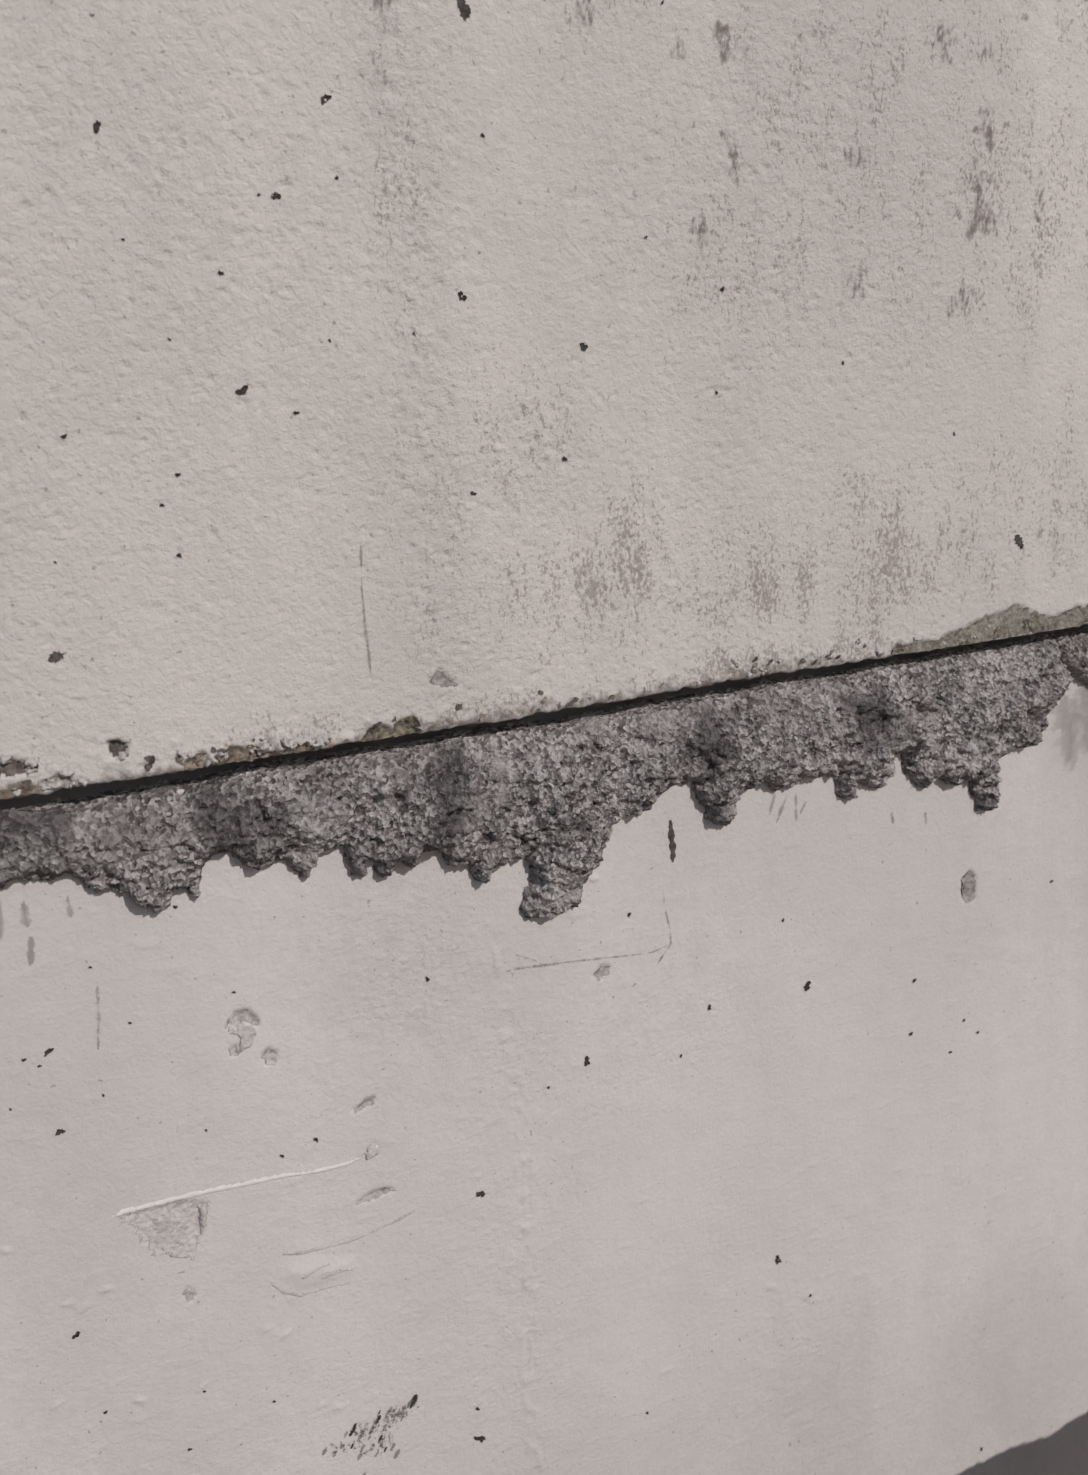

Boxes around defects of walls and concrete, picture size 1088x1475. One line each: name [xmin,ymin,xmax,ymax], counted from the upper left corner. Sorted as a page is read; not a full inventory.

peeling [855,604,1088,657]
peeling [430,671,459,687]
spalling [732,656,781,679]
spalling [535,690,615,713]
spalling [108,739,155,771]
spalling [176,716,437,771]
spalling [0,753,89,797]
crack [668,820,676,862]
peeling [961,870,976,903]